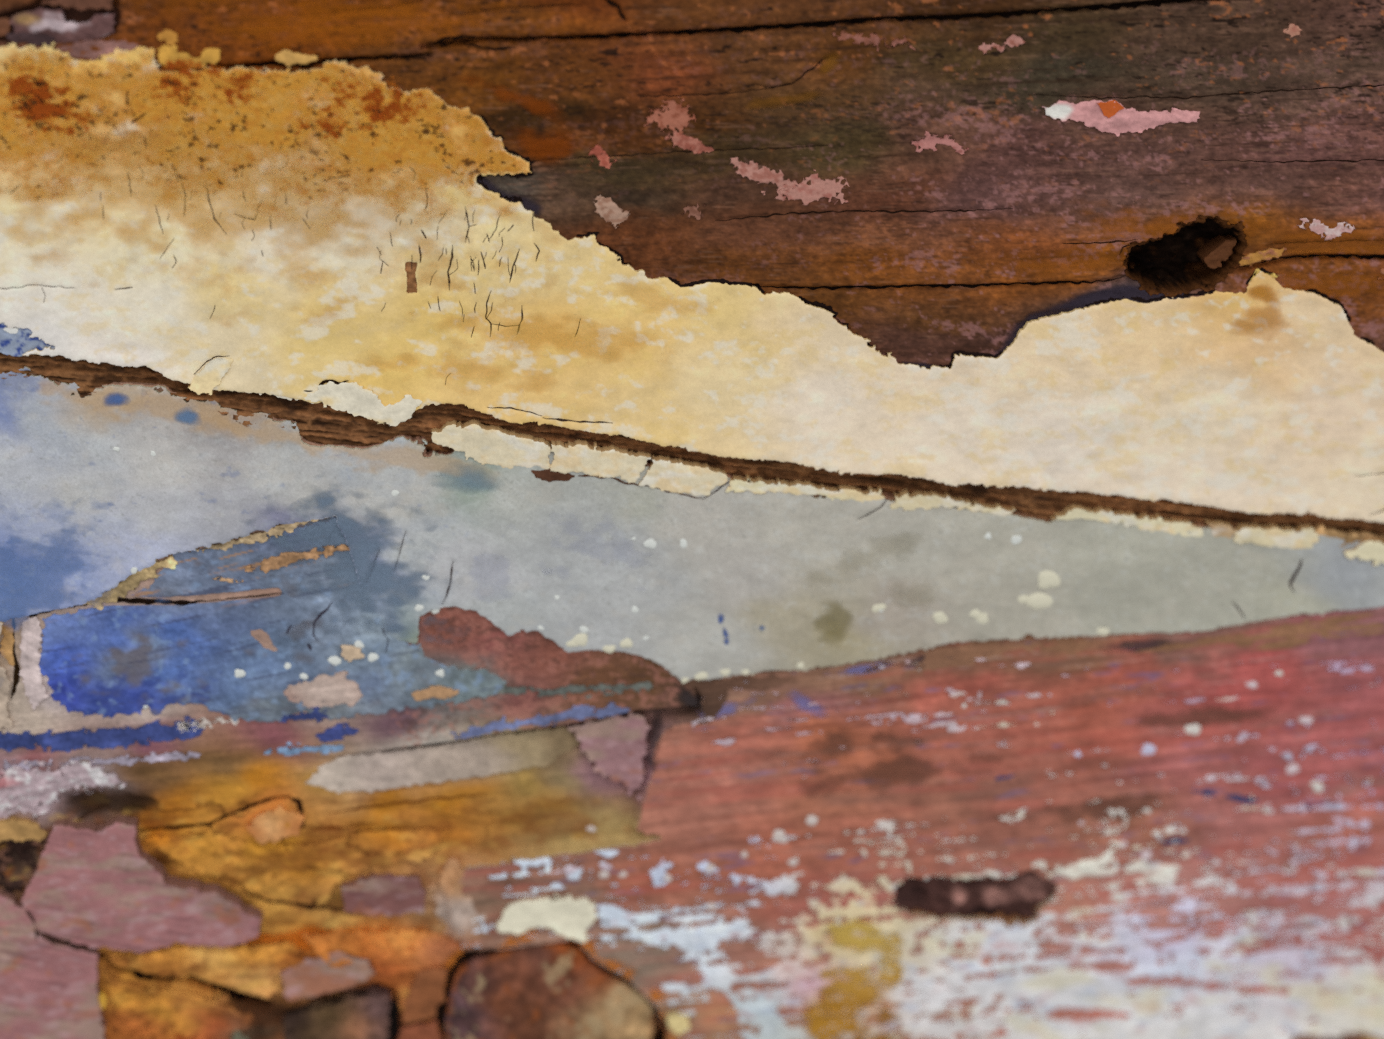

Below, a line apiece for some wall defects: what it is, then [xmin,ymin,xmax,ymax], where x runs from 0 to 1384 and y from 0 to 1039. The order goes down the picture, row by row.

crack [158,0,1221,97]
peeling [0,29,1384,523]
crack [715,208,1013,221]
crack [756,239,1138,290]
crack [1235,239,1384,269]
peeling [0,366,1384,1039]